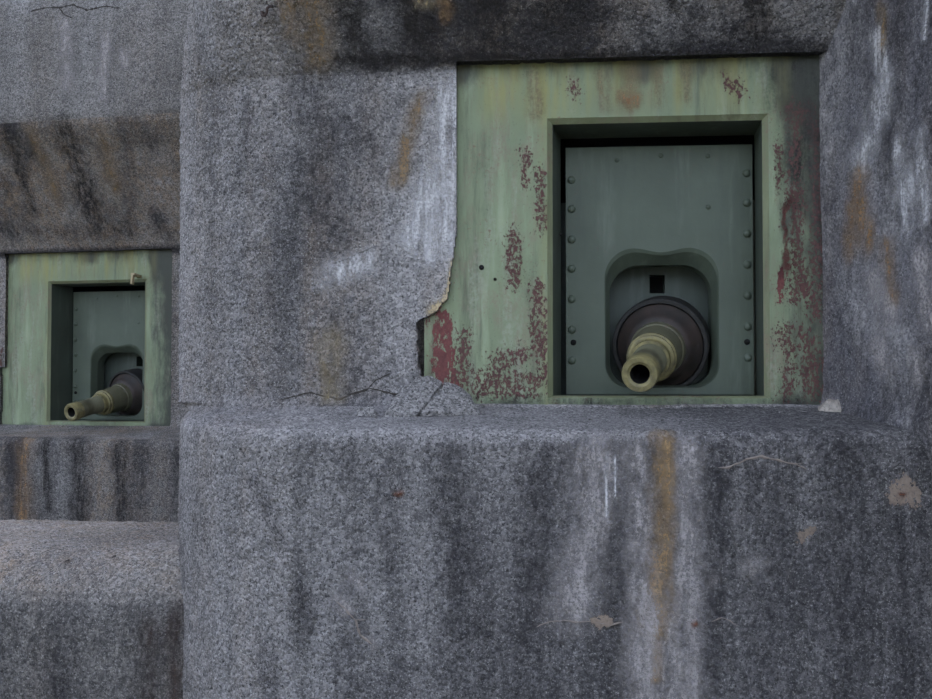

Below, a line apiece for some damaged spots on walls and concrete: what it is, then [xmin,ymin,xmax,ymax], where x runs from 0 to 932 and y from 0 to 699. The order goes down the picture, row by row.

crack [30,4,119,18]
damp [57,122,106,228]
peeling [416,140,548,403]
crack [718,455,806,469]
spalling [885,471,923,510]